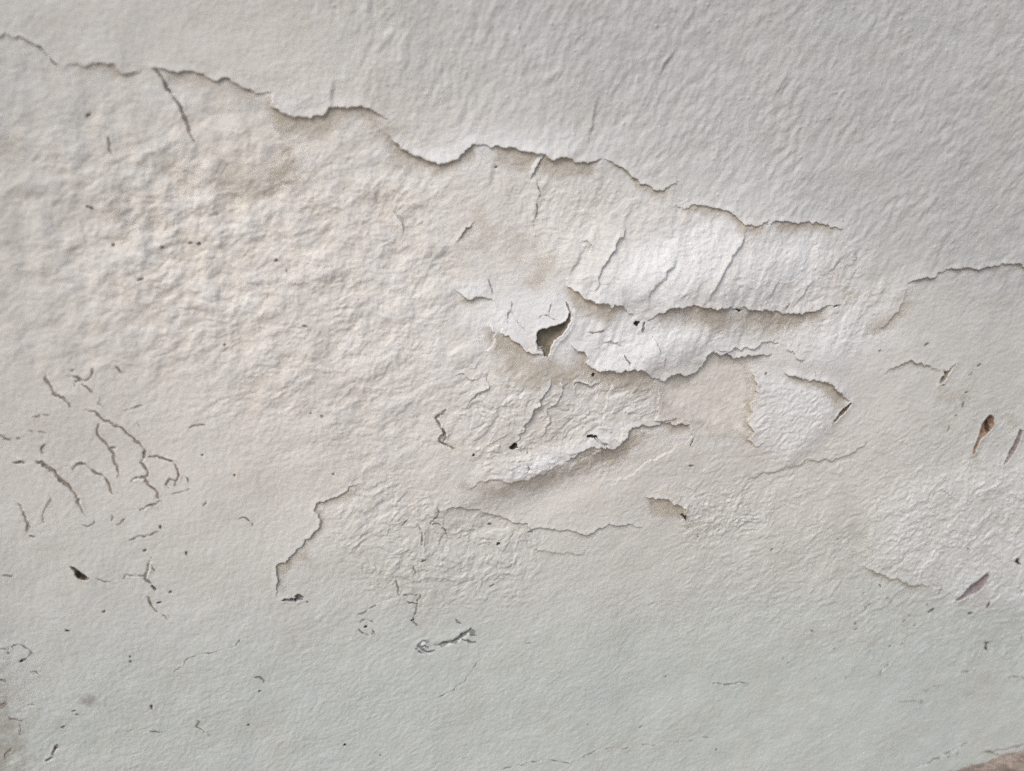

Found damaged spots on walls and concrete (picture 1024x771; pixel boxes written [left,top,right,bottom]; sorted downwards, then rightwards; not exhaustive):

crack [154,69,194,142]
peeling [147,62,390,129]
peeling [388,130,677,194]
peeling [675,196,847,232]
peeling [567,228,838,326]
peeling [906,257,1024,283]
peeling [487,321,546,357]
peeling [563,338,784,462]
peeling [783,366,854,408]
crack [0,366,206,541]
peeling [270,479,360,598]
crack [396,509,476,697]